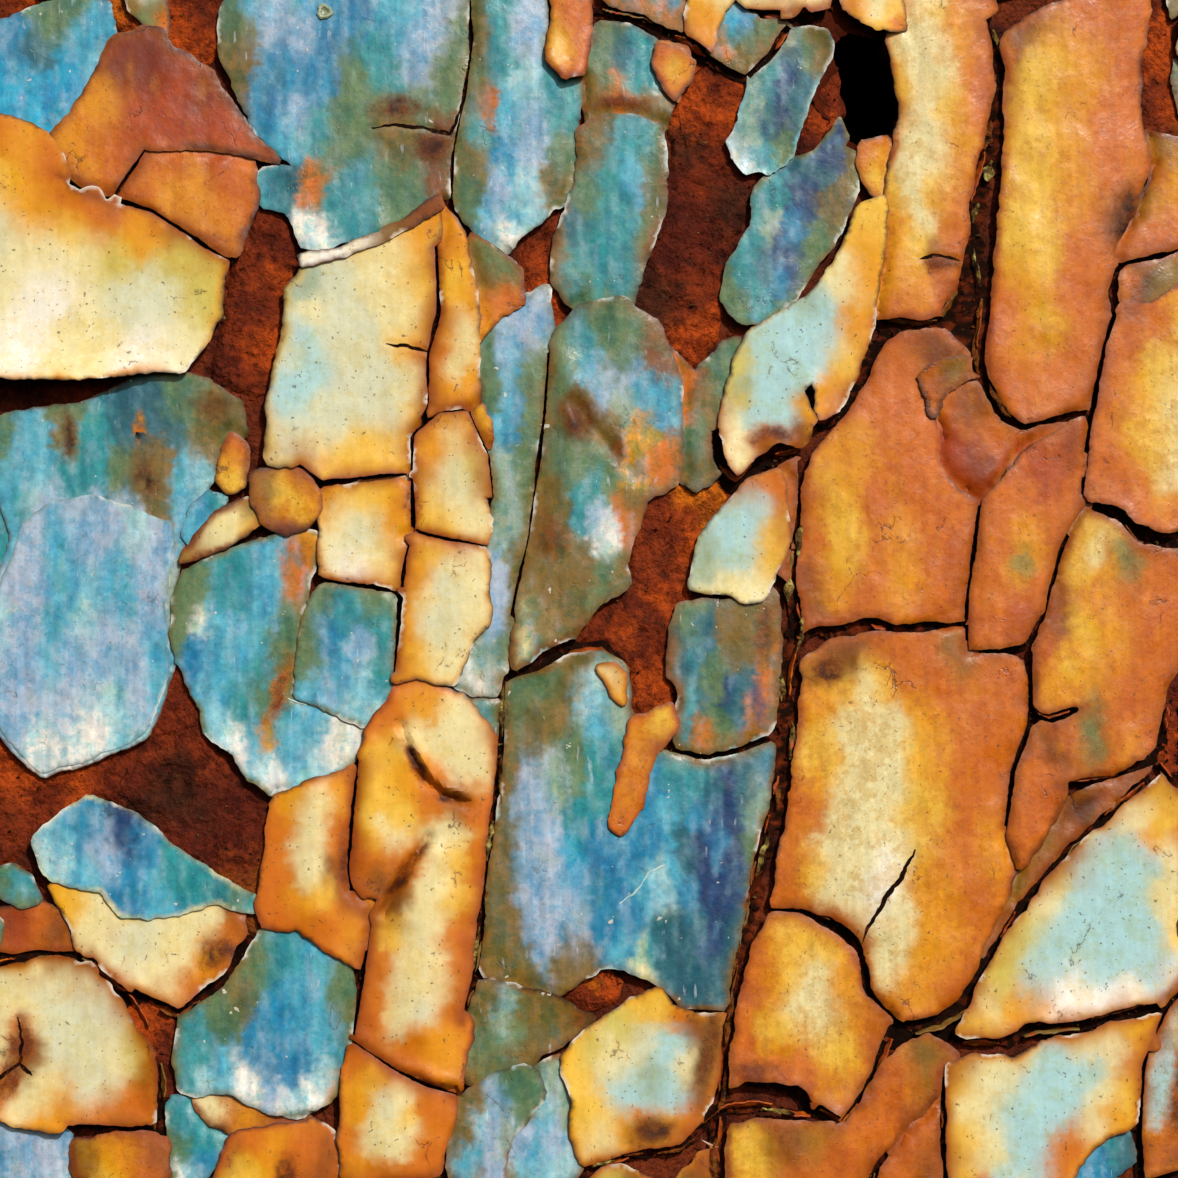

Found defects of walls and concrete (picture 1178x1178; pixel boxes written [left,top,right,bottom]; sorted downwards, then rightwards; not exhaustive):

corrosion [109,0,142,32]
corrosion [168,0,223,66]
corrosion [211,205,299,405]
peeling [0,0,999,797]
corrosion [635,65,764,369]
corrosion [794,72,846,156]
corrosion [572,480,727,713]
peeling [445,0,1178,1178]
crack [579,0,1178,1178]
corrosion [0,665,269,895]
crack [0,1017,33,1080]
peeling [0,794,357,1178]